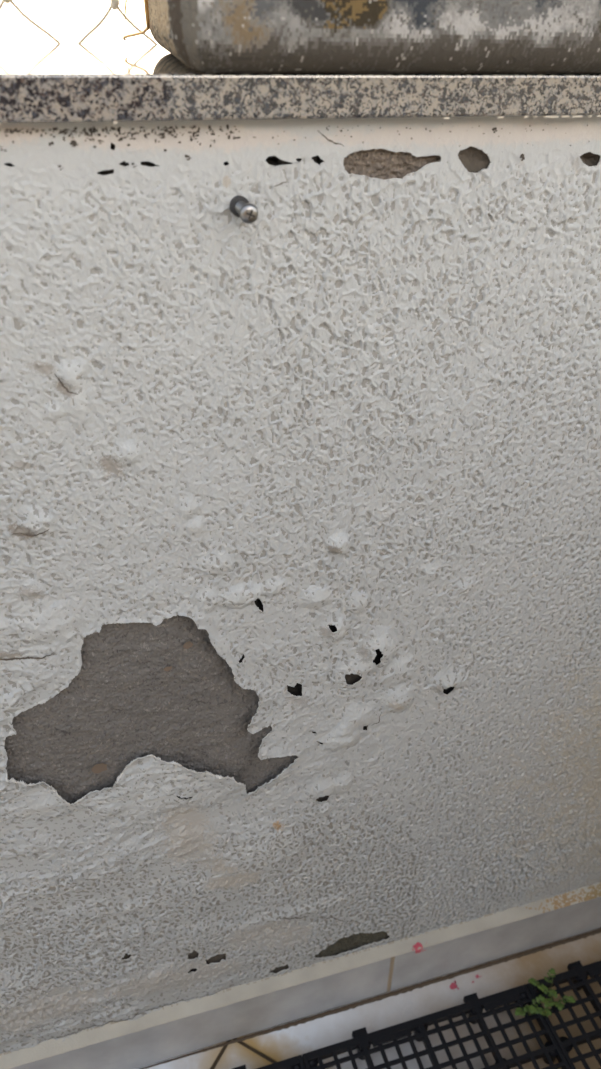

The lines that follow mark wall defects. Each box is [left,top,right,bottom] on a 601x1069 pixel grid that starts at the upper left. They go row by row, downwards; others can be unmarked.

spalling [343,149,441,180]
peeling [4,615,298,805]
spalling [314,931,390,959]